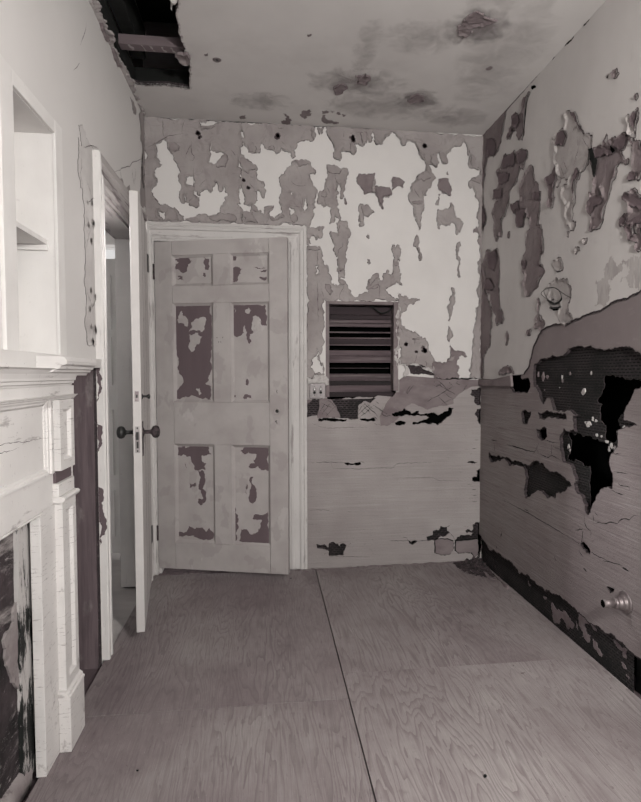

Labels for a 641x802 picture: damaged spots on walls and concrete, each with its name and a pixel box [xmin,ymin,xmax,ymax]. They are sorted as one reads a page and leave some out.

flaking render [89,0,192,116]
leakage [333,83,348,95]
leakage [457,11,498,39]
peeling [176,306,212,400]
peeling [234,305,267,344]
spalling [329,363,390,374]
spalling [329,306,391,351]
flaking render [489,254,641,515]
peeling [178,446,211,505]
crack [505,501,635,571]
flaking render [427,522,641,695]
spalling [1,602,20,689]